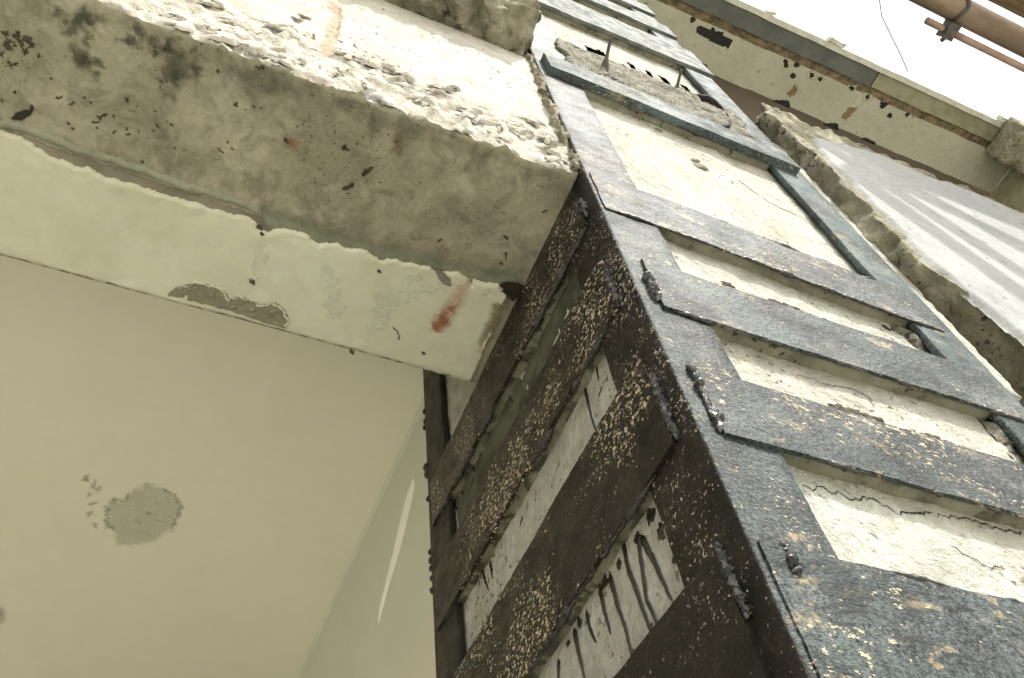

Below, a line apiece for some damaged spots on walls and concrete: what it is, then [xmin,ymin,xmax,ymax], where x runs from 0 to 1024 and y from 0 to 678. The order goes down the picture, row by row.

spalling [0,31,41,68]
water stain [54,8,101,76]
water stain [122,26,201,97]
spalling [152,0,569,170]
peeling [657,0,991,148]
spalling [55,96,173,136]
peeling [2,129,271,236]
spalling [342,166,373,190]
spalling [168,281,290,328]
rust [433,284,465,332]
spalling [882,324,927,351]
crack [803,484,1022,535]